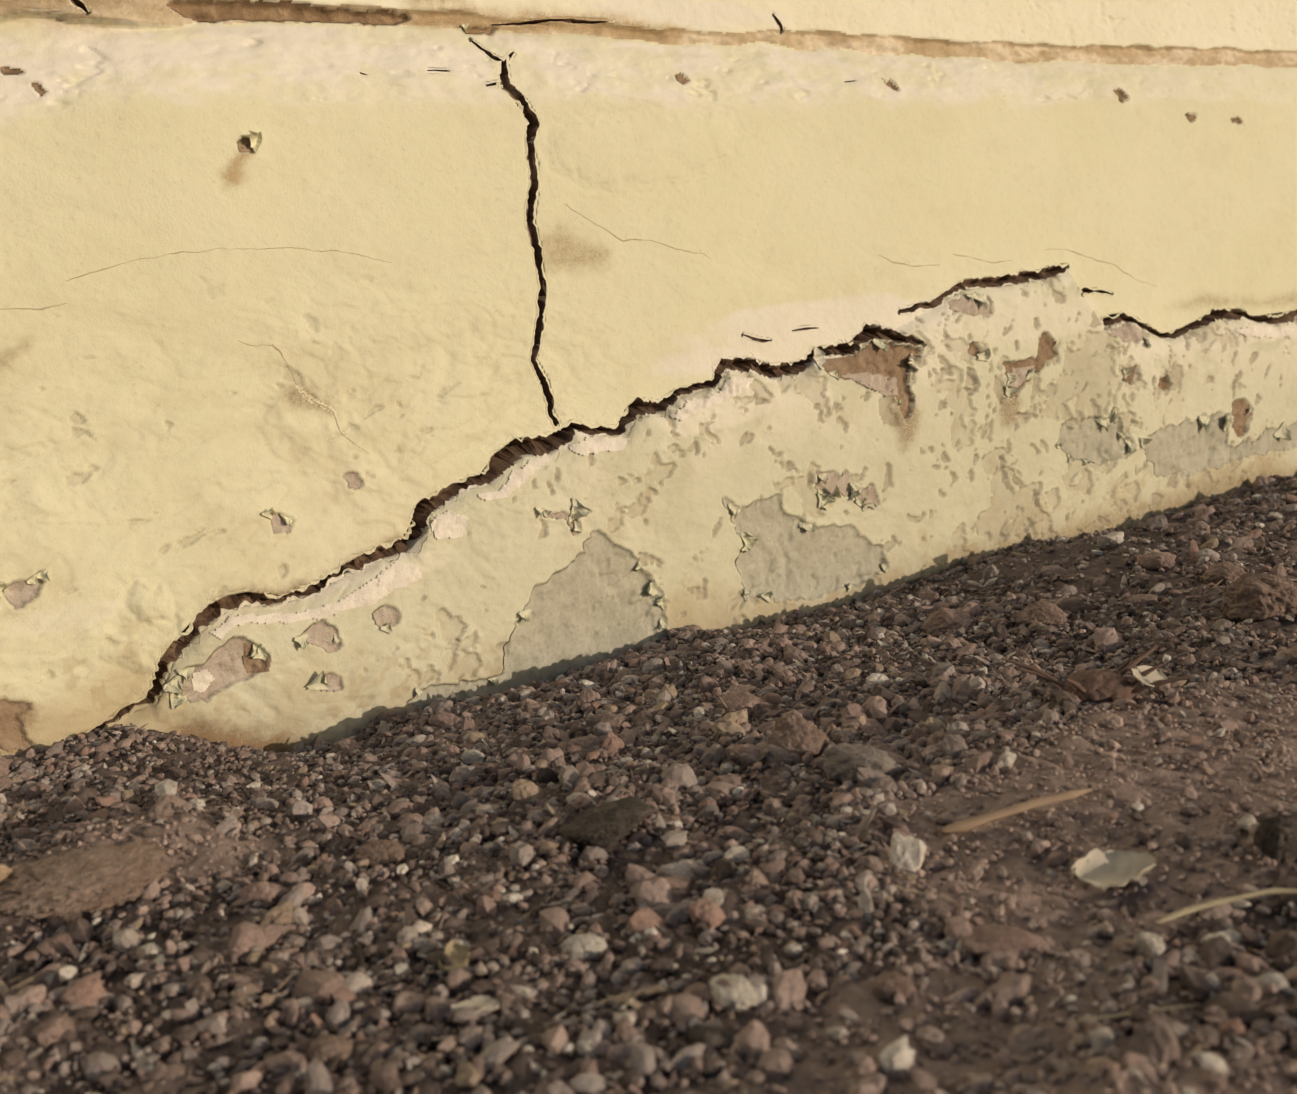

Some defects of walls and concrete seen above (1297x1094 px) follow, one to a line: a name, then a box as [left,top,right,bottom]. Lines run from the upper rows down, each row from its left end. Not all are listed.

crack [66,0,90,14]
spalling [237,131,265,153]
spalling [948,292,993,318]
crack [82,14,1297,734]
spalling [812,338,921,419]
peeling [968,332,1057,398]
peeling [1055,399,1297,477]
spalling [261,507,297,534]
spalling [723,471,890,603]
spalling [0,569,50,612]
spalling [408,498,670,710]
peeling [162,636,272,709]